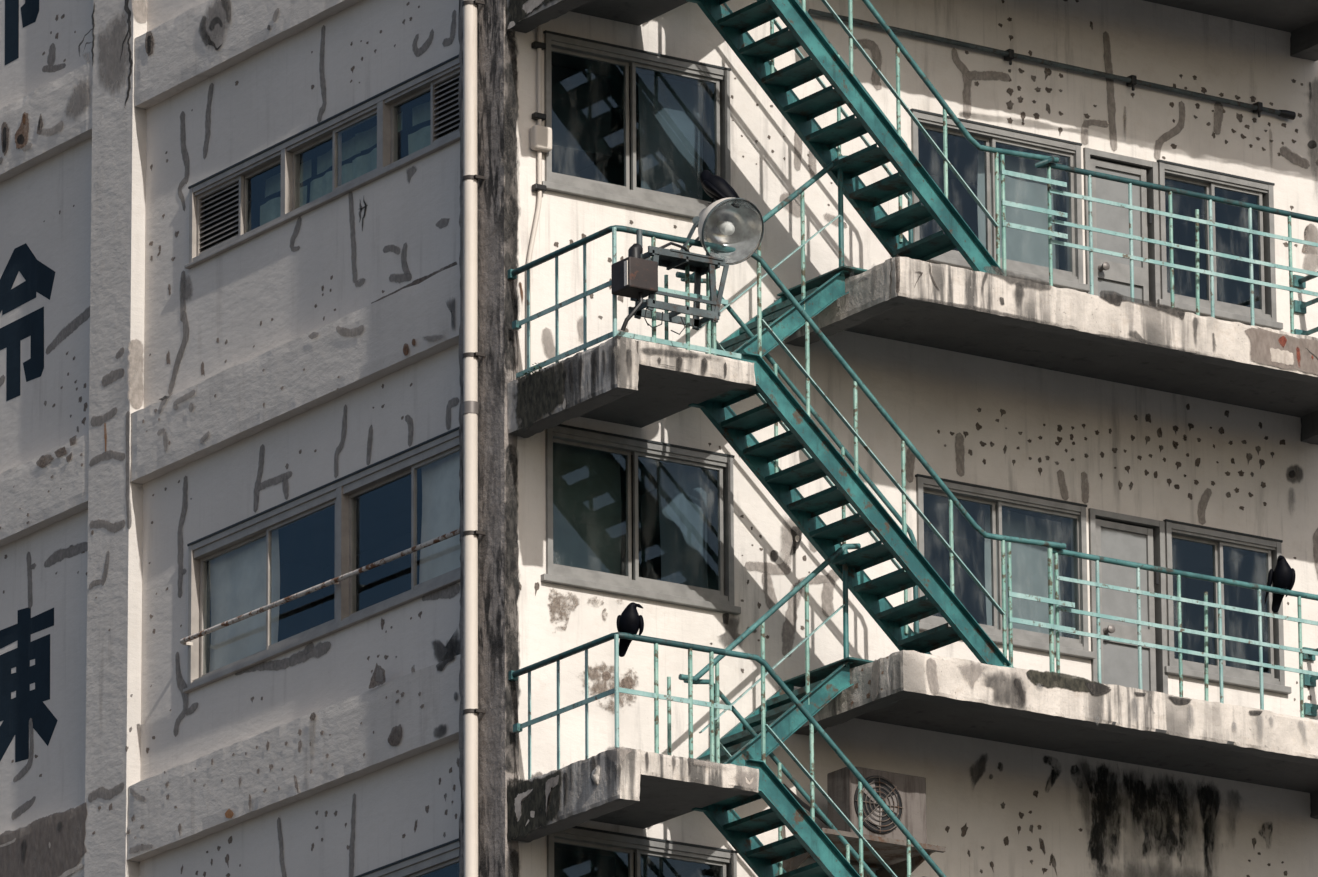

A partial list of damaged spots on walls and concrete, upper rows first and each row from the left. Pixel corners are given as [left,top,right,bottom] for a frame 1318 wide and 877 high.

crack [42,0,133,108]
damp [503,0,727,431]
damp [915,266,1051,323]
damp [1096,291,1215,354]
damp [505,444,571,877]
peeling [583,664,638,713]
damp [721,613,757,646]
damp [590,747,649,785]
damp [673,756,718,775]
damp [737,772,757,788]
peeling [0,803,112,877]
damp [1044,756,1220,877]